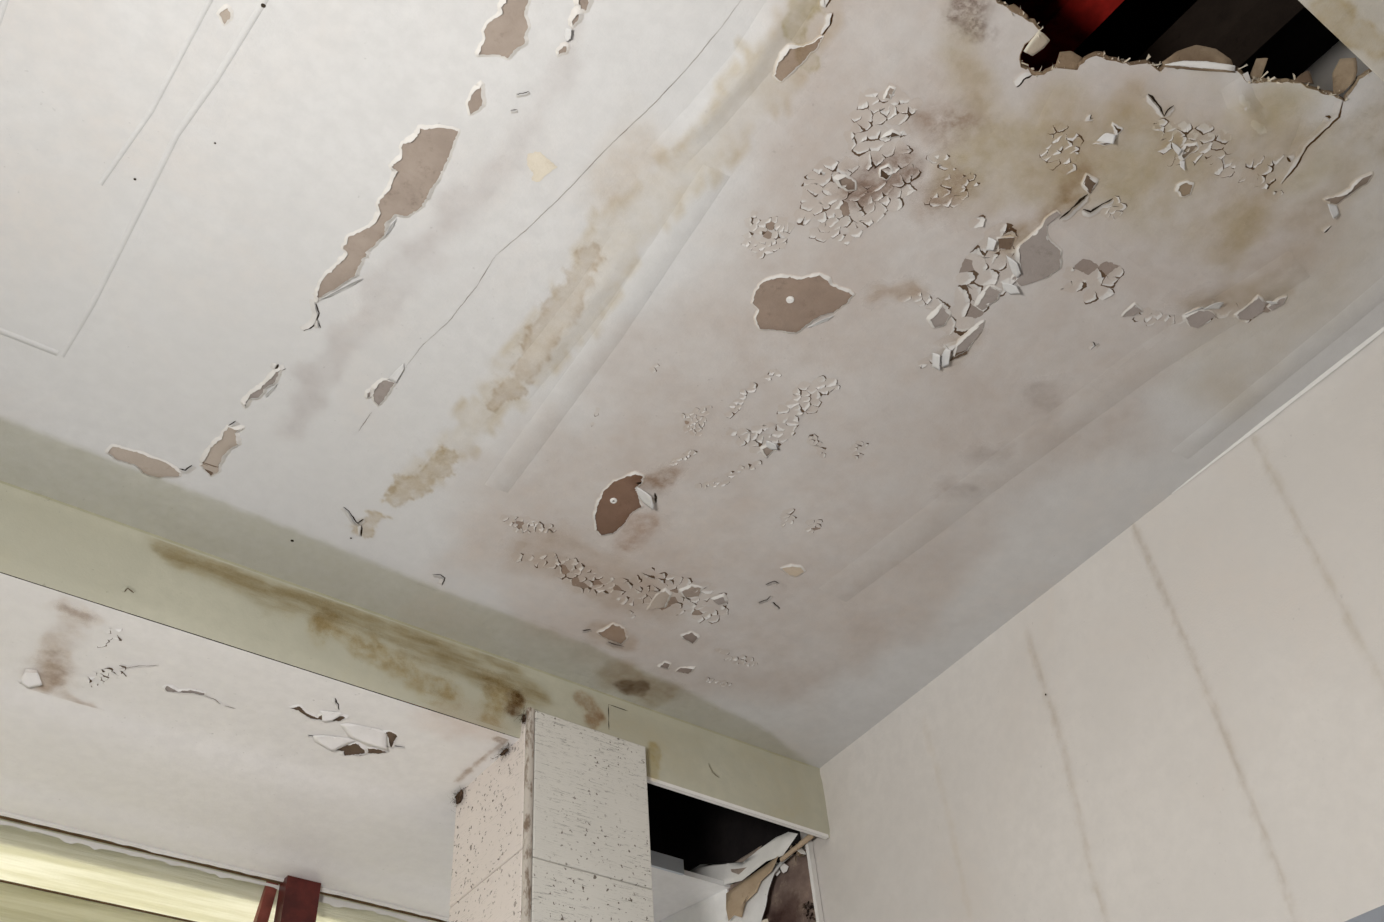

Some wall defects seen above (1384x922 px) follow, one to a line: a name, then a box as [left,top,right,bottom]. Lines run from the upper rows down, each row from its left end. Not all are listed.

spalling [996,0,1372,101]